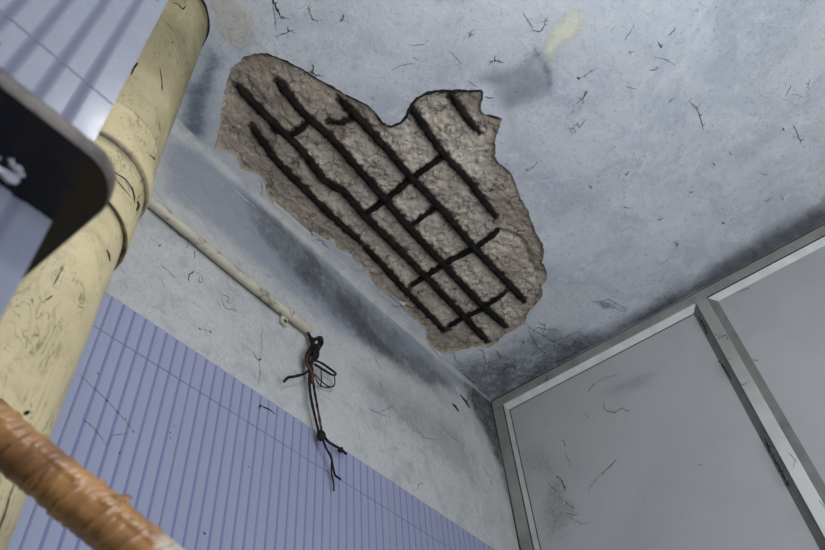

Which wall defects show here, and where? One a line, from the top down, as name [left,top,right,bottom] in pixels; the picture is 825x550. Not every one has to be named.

spalling [214,53,547,363]
damp [461,329,604,466]